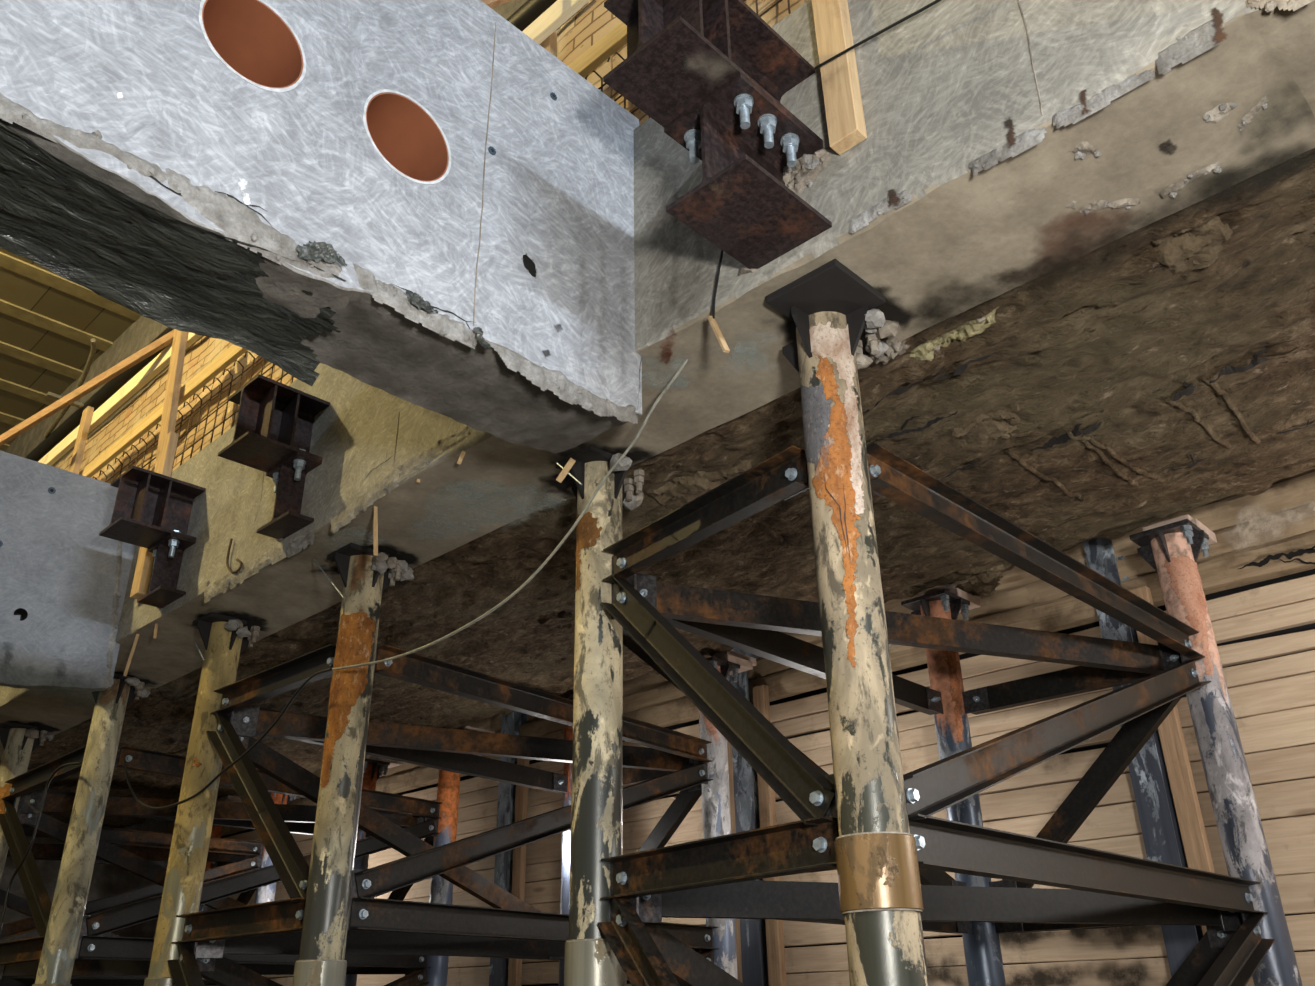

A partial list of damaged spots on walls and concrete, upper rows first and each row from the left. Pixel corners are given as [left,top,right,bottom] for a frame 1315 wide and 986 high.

spalling [1245,0,1314,12]
spalling [969,8,1227,177]
damp [238,178,250,206]
spalling [783,147,831,194]
spalling [0,93,638,424]
spalling [873,288,915,326]
rust [576,512,602,591]
spalling [647,460,753,511]
rust [812,356,863,667]
rust [1164,555,1214,675]
rust [321,612,376,788]
rust [942,650,963,742]